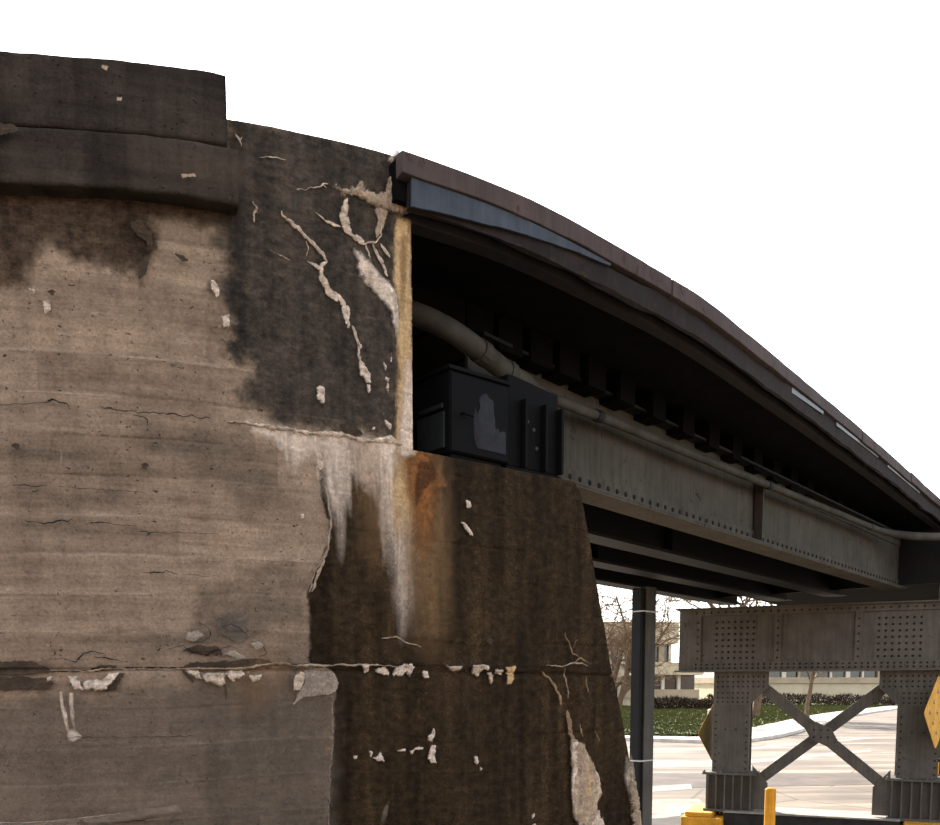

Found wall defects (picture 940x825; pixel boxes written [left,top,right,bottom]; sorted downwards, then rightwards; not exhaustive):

crack [270,183,390,355]
damp [0,120,635,825]
crack [309,476,332,592]
rust [394,450,445,606]
peeling [293,668,339,705]
crack [45,632,610,692]
crack [328,694,336,825]